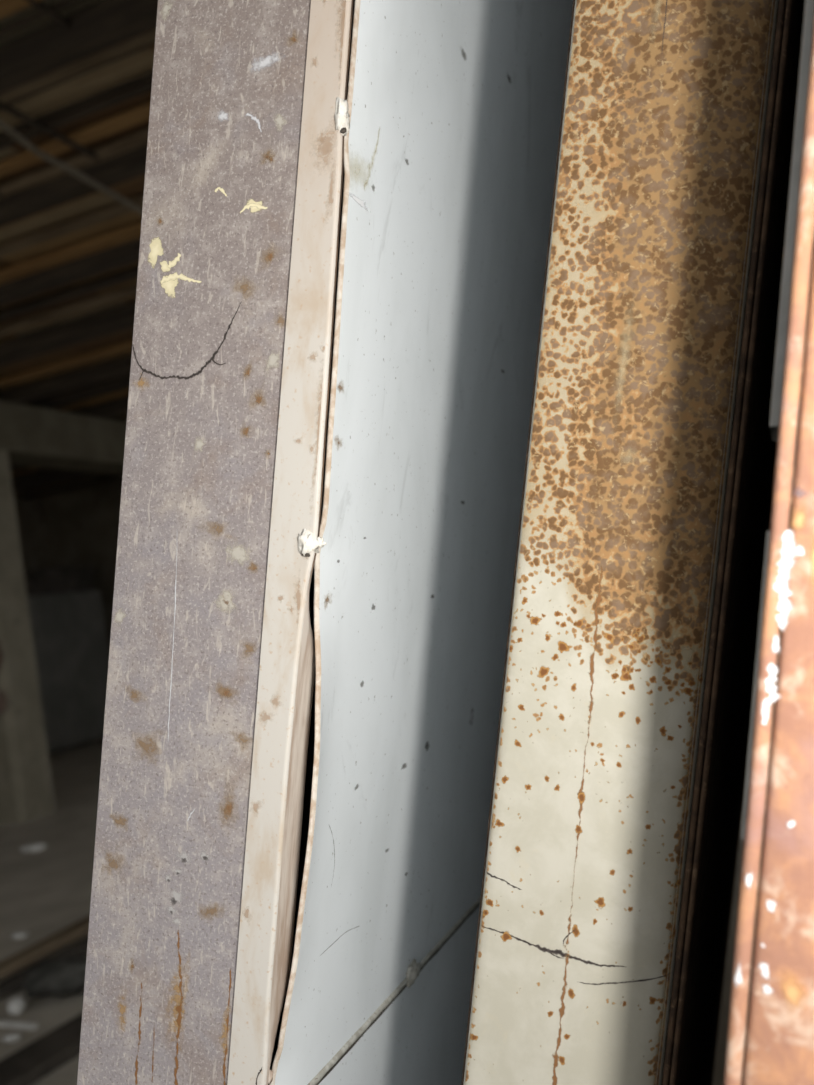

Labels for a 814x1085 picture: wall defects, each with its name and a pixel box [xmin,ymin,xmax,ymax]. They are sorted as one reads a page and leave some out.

crack [132,301,242,380]
corrosion [500,0,775,1085]
corrosion [792,512,805,528]
corrosion [477,759,521,969]
crack [486,872,522,890]
crack [482,926,671,985]
corrosion [167,931,184,1085]
corrosion [222,969,231,1085]
corrosion [465,985,479,1082]